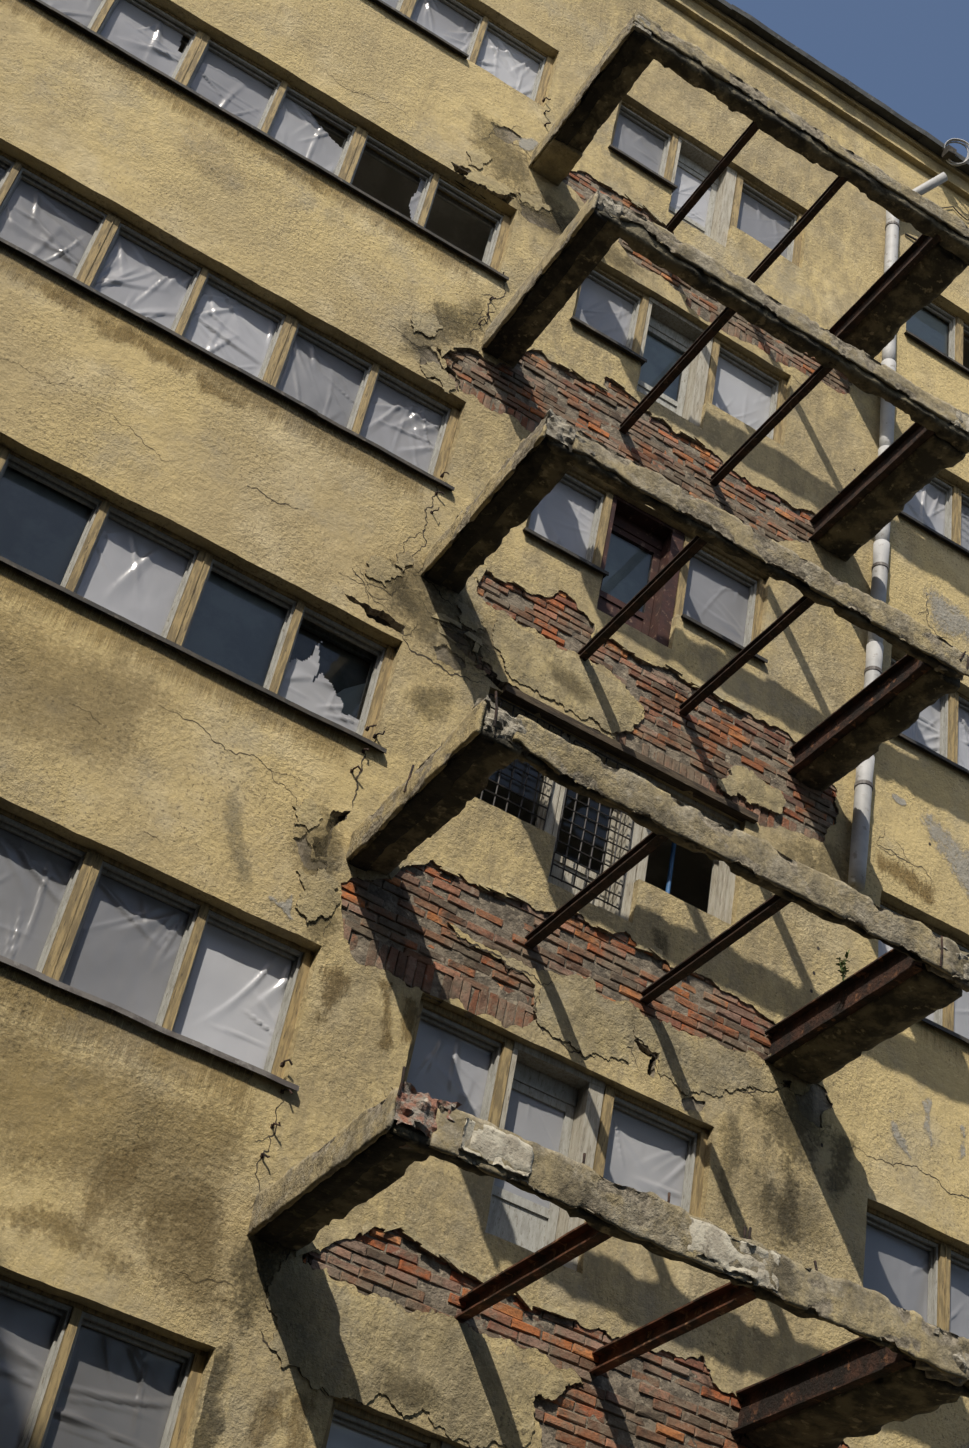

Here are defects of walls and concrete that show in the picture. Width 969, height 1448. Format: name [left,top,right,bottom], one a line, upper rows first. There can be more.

flaking render [491,122,538,150]
flaking render [451,147,563,235]
flaking render [410,311,815,543]
flaking render [432,567,839,842]
crack [352,754,366,808]
flaking render [341,860,775,1060]
flaking render [634,1038,658,1077]
crack [248,1088,283,1210]
damp [778,1158,798,1245]
damp [827,1136,855,1197]
flaking render [295,1219,760,1448]